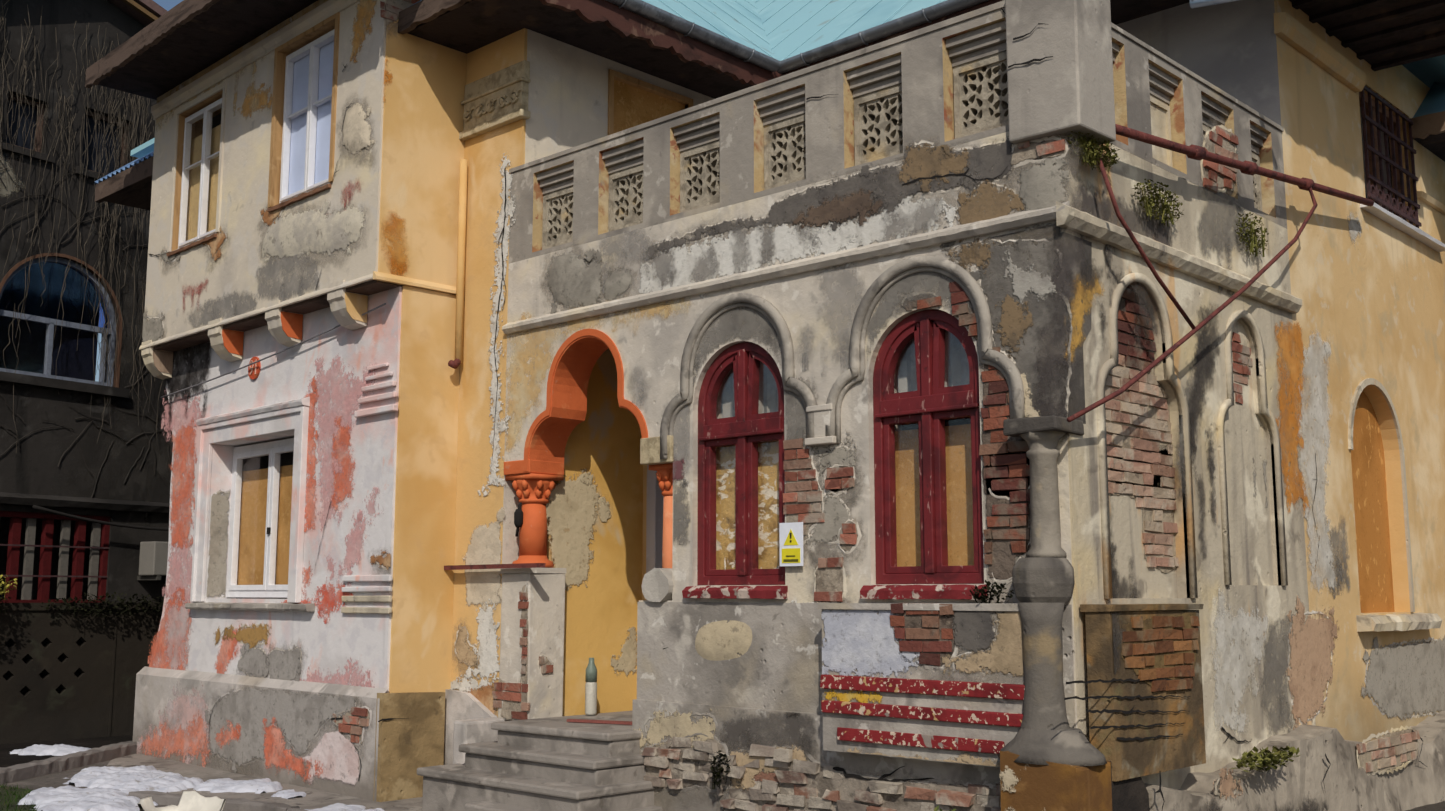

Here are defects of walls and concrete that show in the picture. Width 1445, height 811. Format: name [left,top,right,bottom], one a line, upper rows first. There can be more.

crack [1001,7,1053,68]
peeling [148,392,230,670]
spalling [137,623,372,785]
peeling [281,357,391,624]
crack [492,168,506,456]
peeling [451,507,554,720]
spalling [634,709,1018,811]
peeling [637,135,1103,585]
crack [833,766,935,782]
peeling [783,432,1024,704]
spalling [1105,285,1179,574]
spalling [1356,637,1445,776]